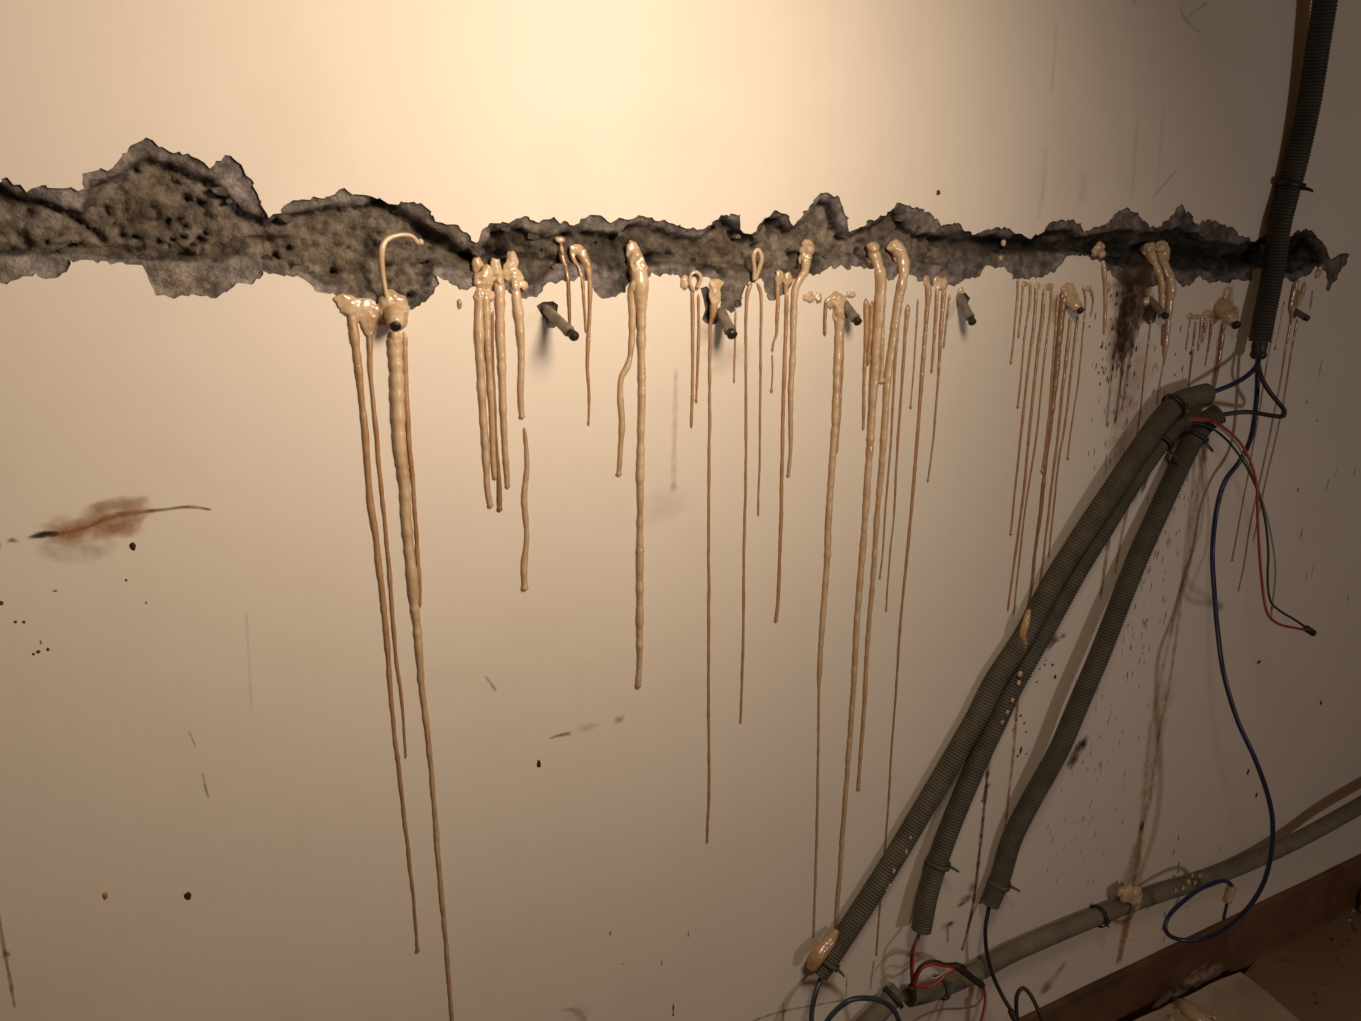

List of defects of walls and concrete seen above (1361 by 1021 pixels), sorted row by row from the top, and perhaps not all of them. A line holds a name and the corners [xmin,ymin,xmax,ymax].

spalling [0,138,1267,328]
spalling [1284,228,1349,291]
water stain [1007,240,1239,615]
corrosion [32,505,210,539]
water stain [1117,913,1132,961]